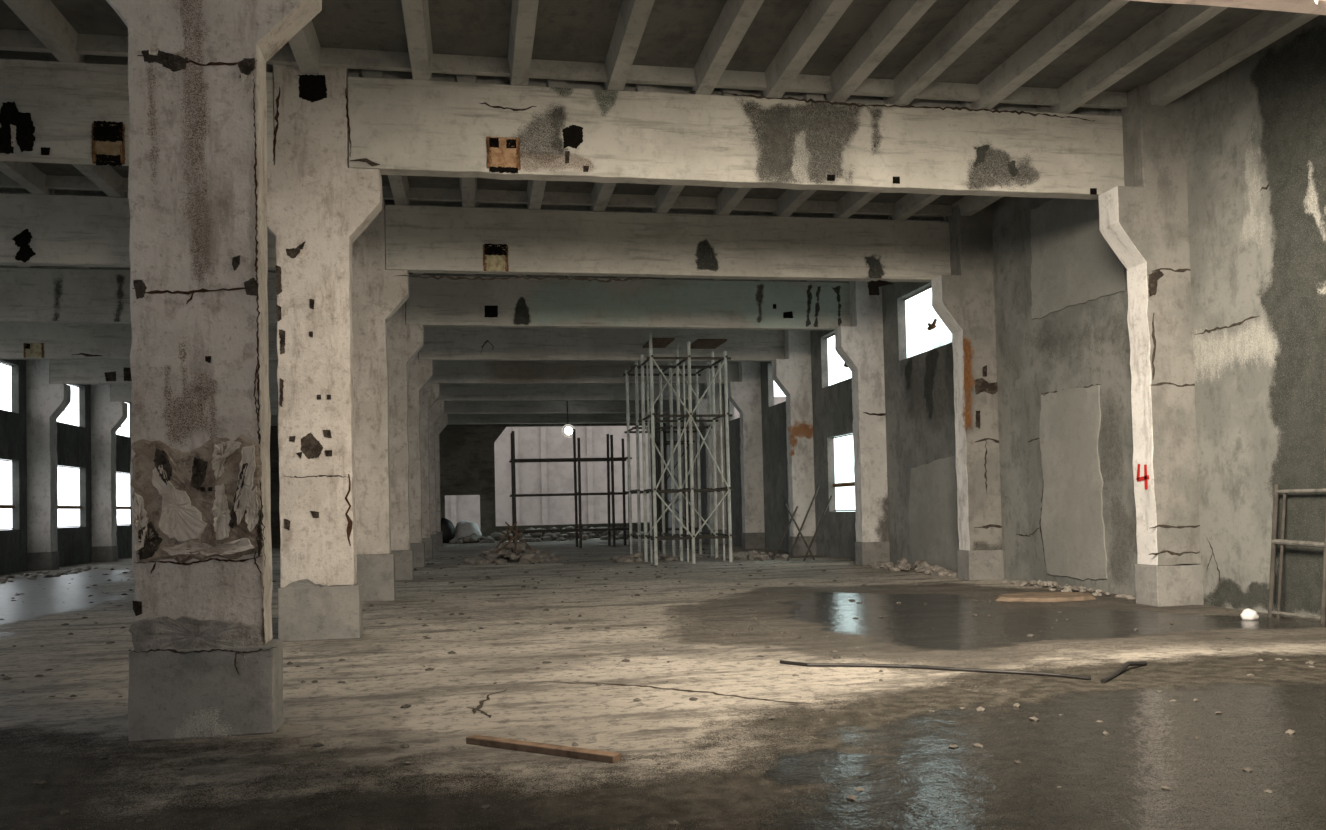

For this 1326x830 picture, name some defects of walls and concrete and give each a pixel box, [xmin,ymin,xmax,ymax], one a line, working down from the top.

spalling [0,102,50,155]
crack [345,89,380,166]
damp [513,87,594,173]
damp [736,97,884,185]
damp [966,139,1041,191]
spalling [12,229,36,263]
crack [132,59,353,573]
spalling [289,430,332,459]
rust [788,421,813,456]
peeling [130,434,266,645]